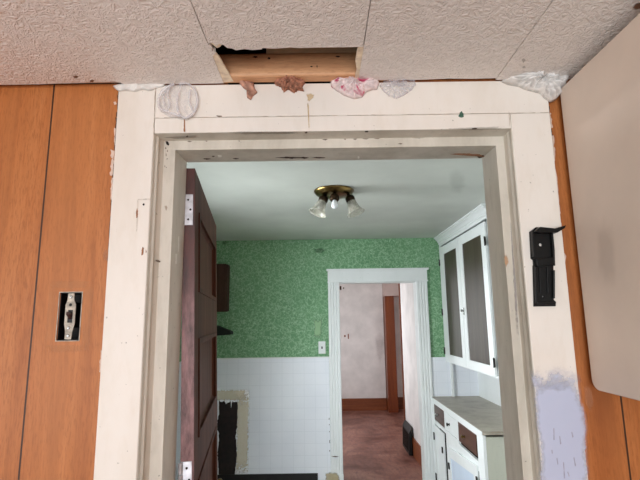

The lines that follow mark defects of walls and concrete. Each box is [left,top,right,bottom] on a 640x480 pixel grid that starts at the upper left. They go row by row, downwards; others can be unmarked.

spalling [211,43,266,85]
spalling [355,45,364,79]
peeling [217,401,238,474]
peeling [532,374,587,480]